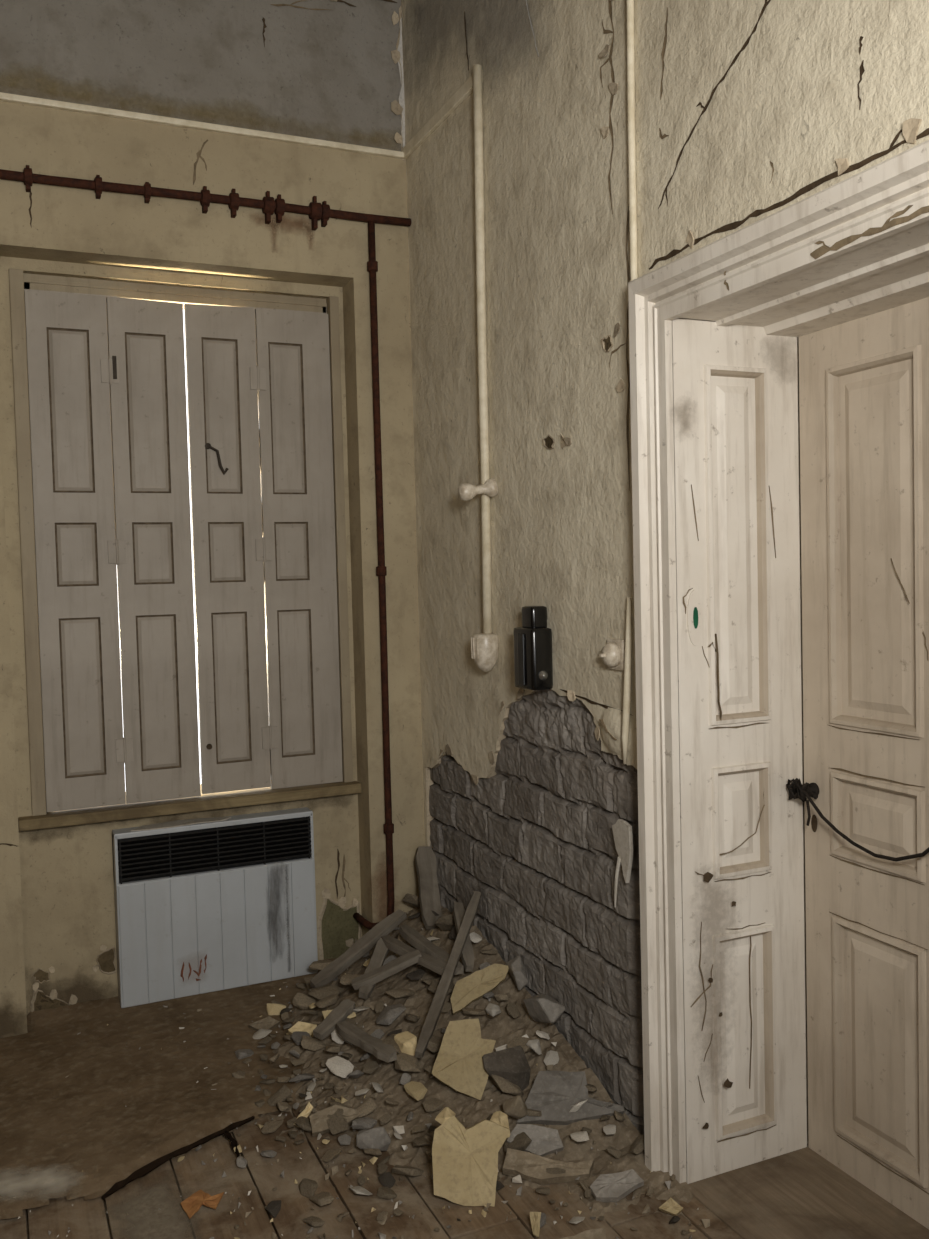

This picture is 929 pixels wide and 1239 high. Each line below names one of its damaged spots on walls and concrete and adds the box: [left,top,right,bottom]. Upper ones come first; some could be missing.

crack [262,0,397,47]
crack [599,0,929,491]
flaking render [429,688,644,1135]